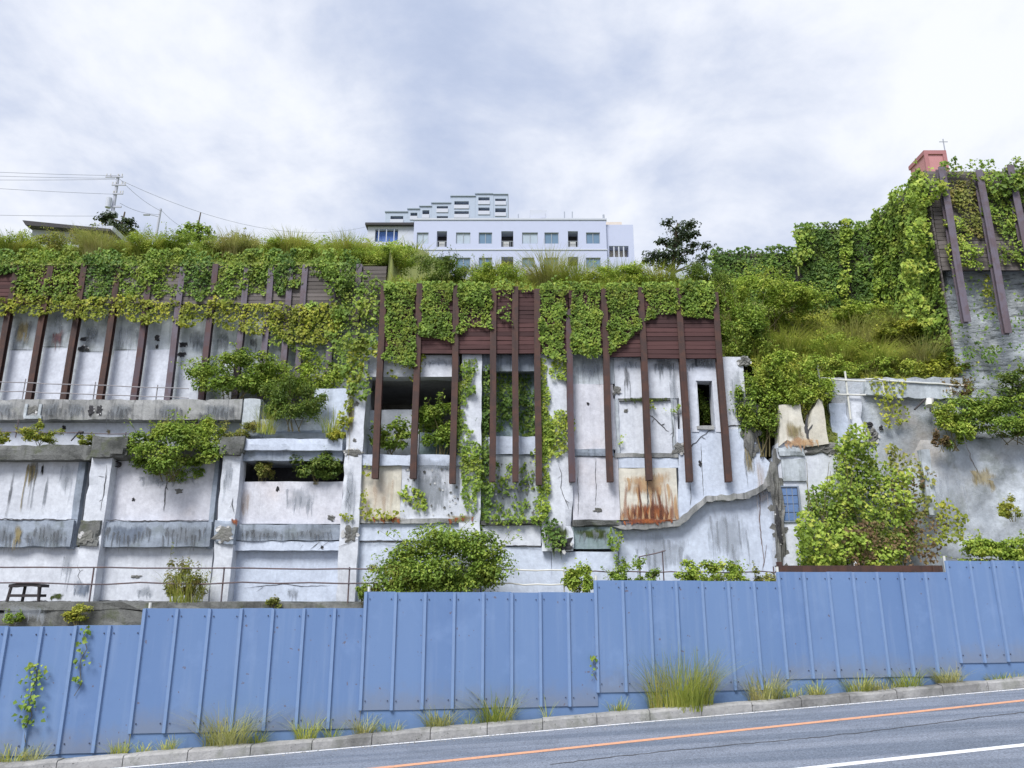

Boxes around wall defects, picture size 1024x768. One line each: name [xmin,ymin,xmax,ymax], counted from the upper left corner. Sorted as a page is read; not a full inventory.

water stain [0,463,66,550]
spalling [78,530,93,545]
water stain [105,526,205,549]
spalling [327,515,360,543]
crack [558,463,596,508]
corrosion [621,476,679,525]